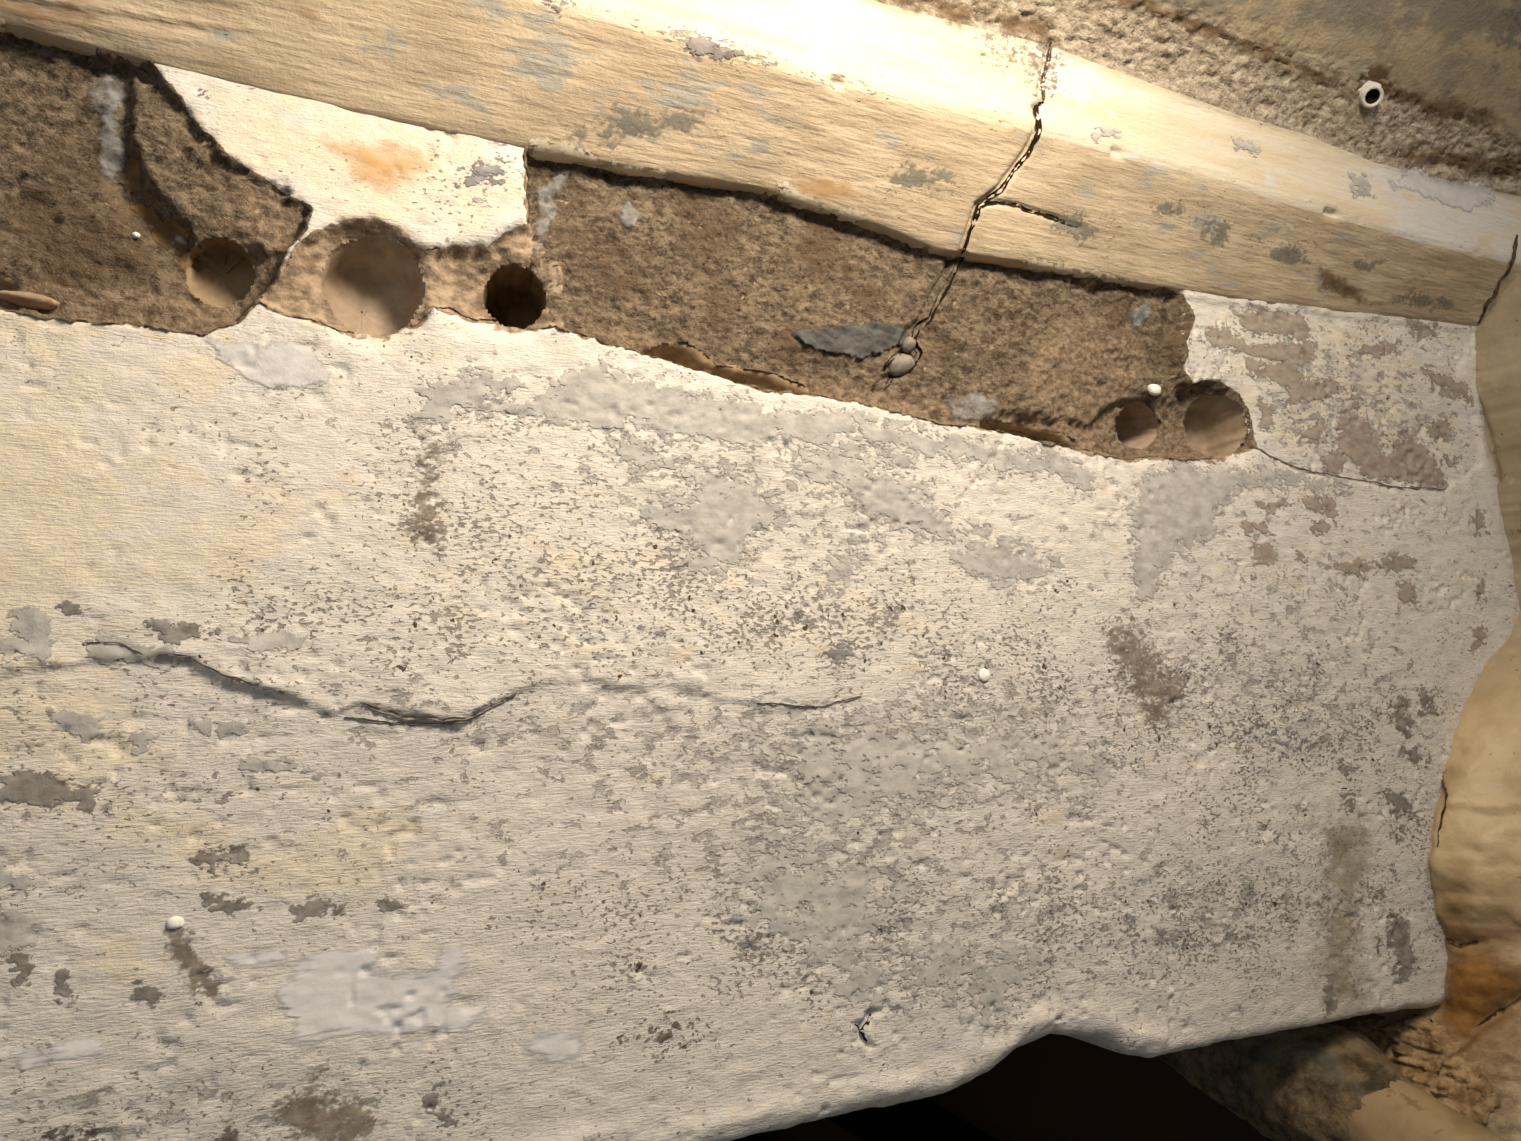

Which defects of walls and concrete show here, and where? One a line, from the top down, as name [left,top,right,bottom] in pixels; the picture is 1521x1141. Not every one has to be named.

crack [883,42,1071,387]
flaking render [0,17,1496,605]
crack [1478,234,1518,324]
crack [85,642,251,683]
peeling [1468,622,1489,653]
crack [345,693,517,725]